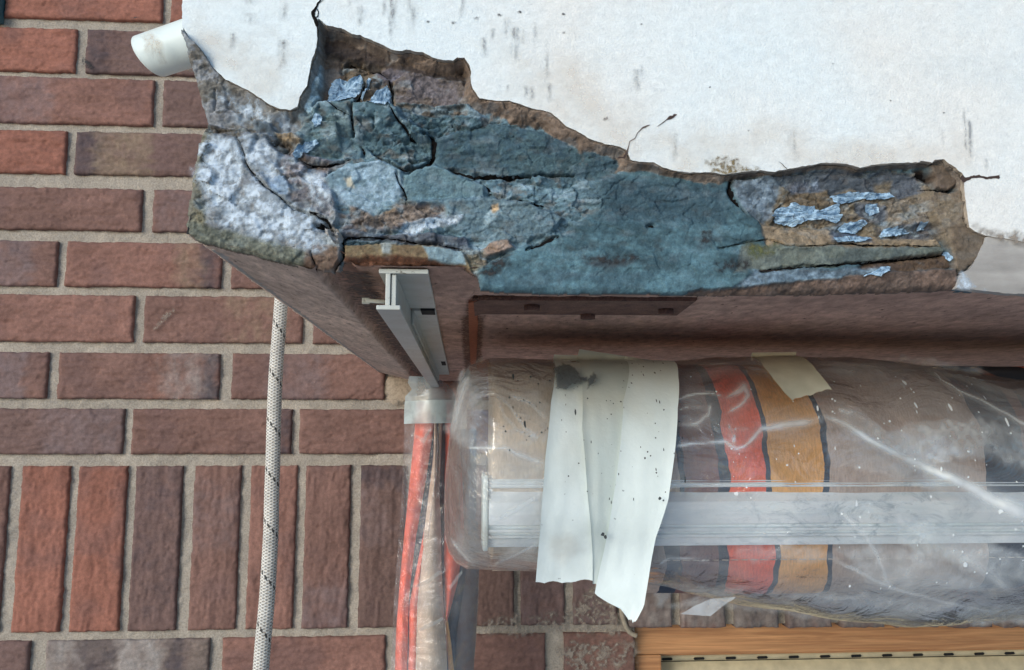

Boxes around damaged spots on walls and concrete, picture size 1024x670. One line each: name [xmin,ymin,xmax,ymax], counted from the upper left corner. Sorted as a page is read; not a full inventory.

crack [238,140,462,274]
crack [302,65,544,207]
crack [531,237,558,249]
spalling [181,20,1024,297]
crack [618,114,677,159]
crack [914,174,1000,193]